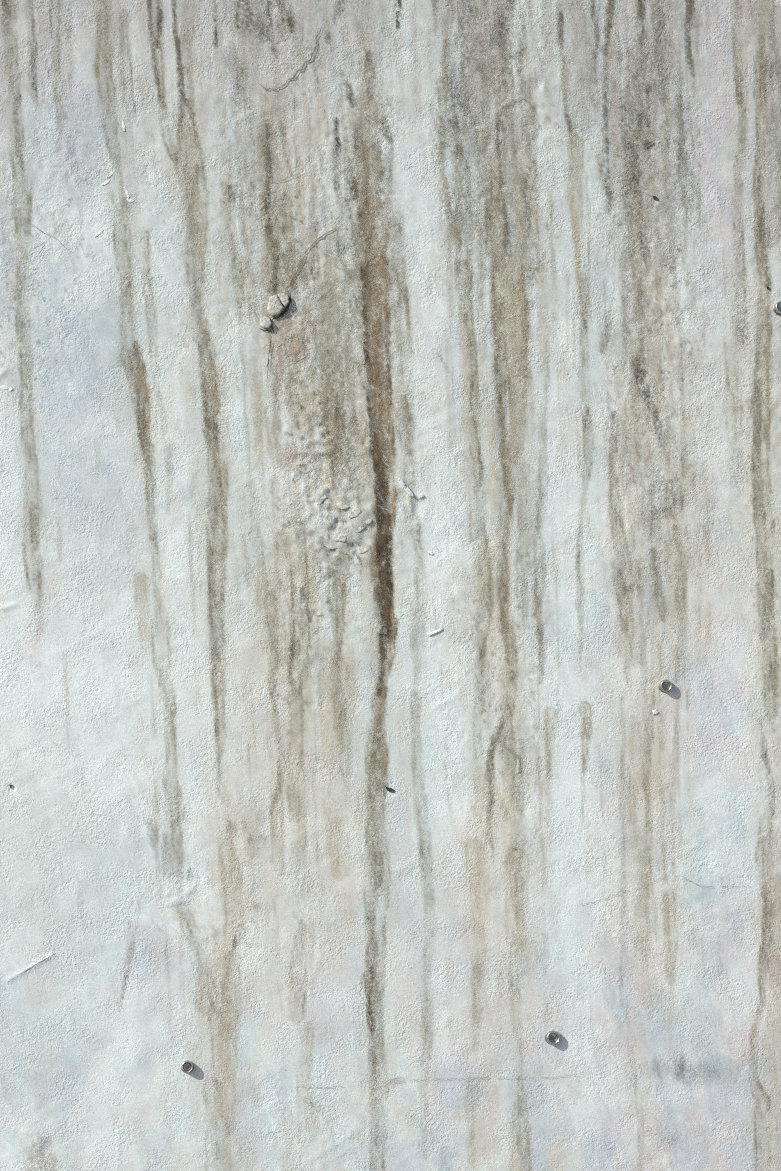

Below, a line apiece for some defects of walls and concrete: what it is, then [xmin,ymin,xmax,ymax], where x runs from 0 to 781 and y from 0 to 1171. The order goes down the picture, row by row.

leakage [147,0,194,136]
crack [260,27,322,91]
leakage [557,0,613,60]
leakage [686,0,694,69]
leakage [122,346,150,470]
flaking render [259,293,291,377]
leakage [262,120,294,283]
crack [285,228,336,294]
leakage [485,181,525,404]
leakage [633,333,658,420]
leakage [732,2,781,488]
leakage [199,330,227,627]